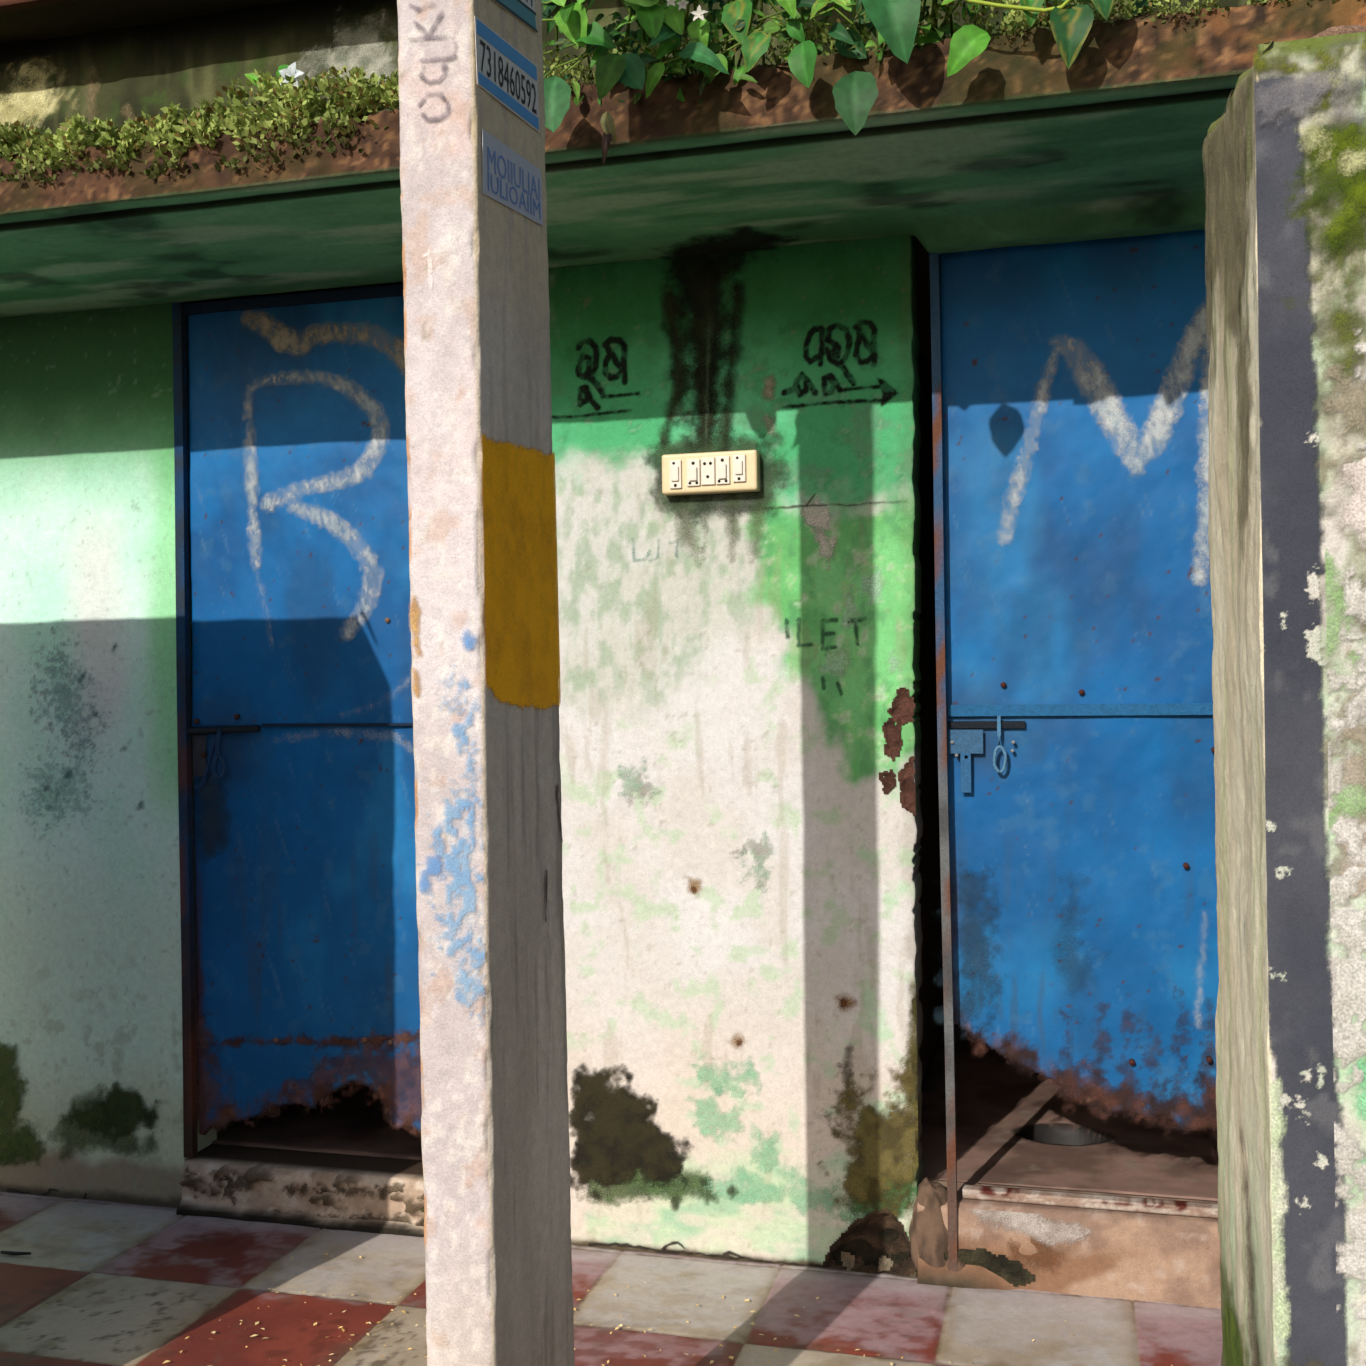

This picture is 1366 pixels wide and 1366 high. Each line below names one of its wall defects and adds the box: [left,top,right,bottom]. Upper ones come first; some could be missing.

water stain [647,227,796,549]
peeling [802,498,836,558]
peeling [1324,330,1366,540]
peeling [879,688,916,816]
peeling [1300,566,1366,1093]
water stain [0,1043,158,1165]
corrosion [206,1032,422,1133]
water stain [569,1064,735,1209]
water stain [831,1005,919,1227]
corrosion [974,1032,1217,1133]
peeling [1270,1079,1311,1344]
peeling [1313,1124,1366,1319]